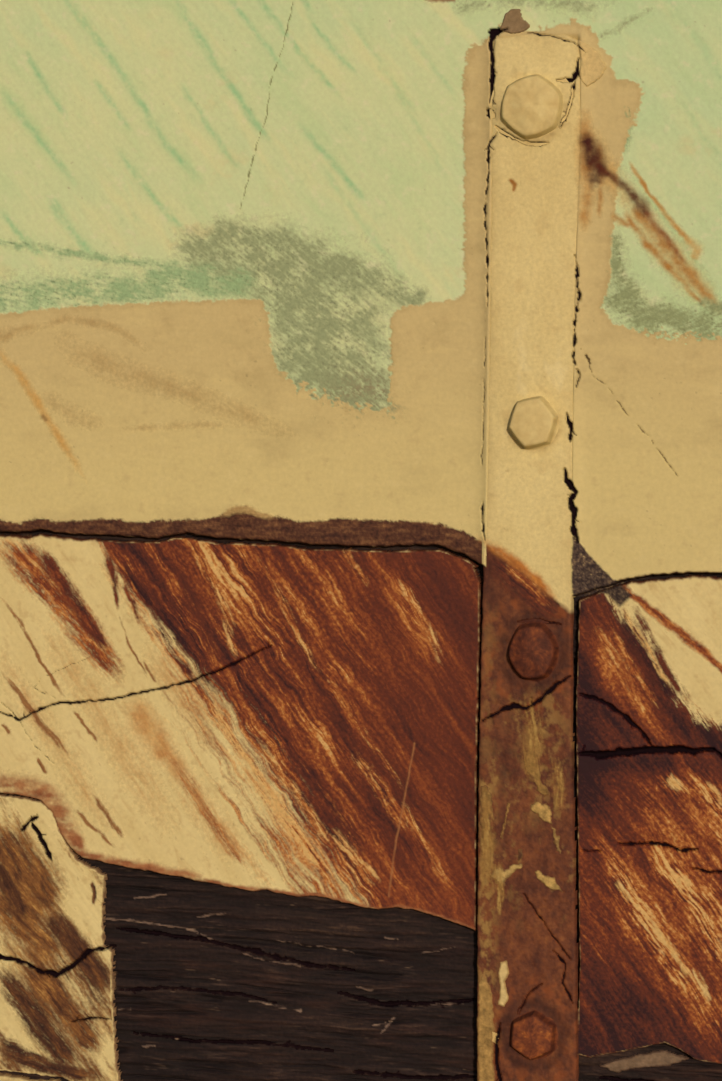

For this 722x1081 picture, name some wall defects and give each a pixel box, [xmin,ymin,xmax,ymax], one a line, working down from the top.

rust [507,177,520,193]
crack [482,26,587,307]
rust [571,107,721,305]
peeling [0,209,432,431]
crack [0,639,272,764]
rust [0,503,563,926]
crack [480,675,722,761]
rust [576,584,722,1064]
crack [580,840,722,875]
crack [0,927,477,1009]
crack [353,893,574,1081]
peeling [599,1050,689,1073]